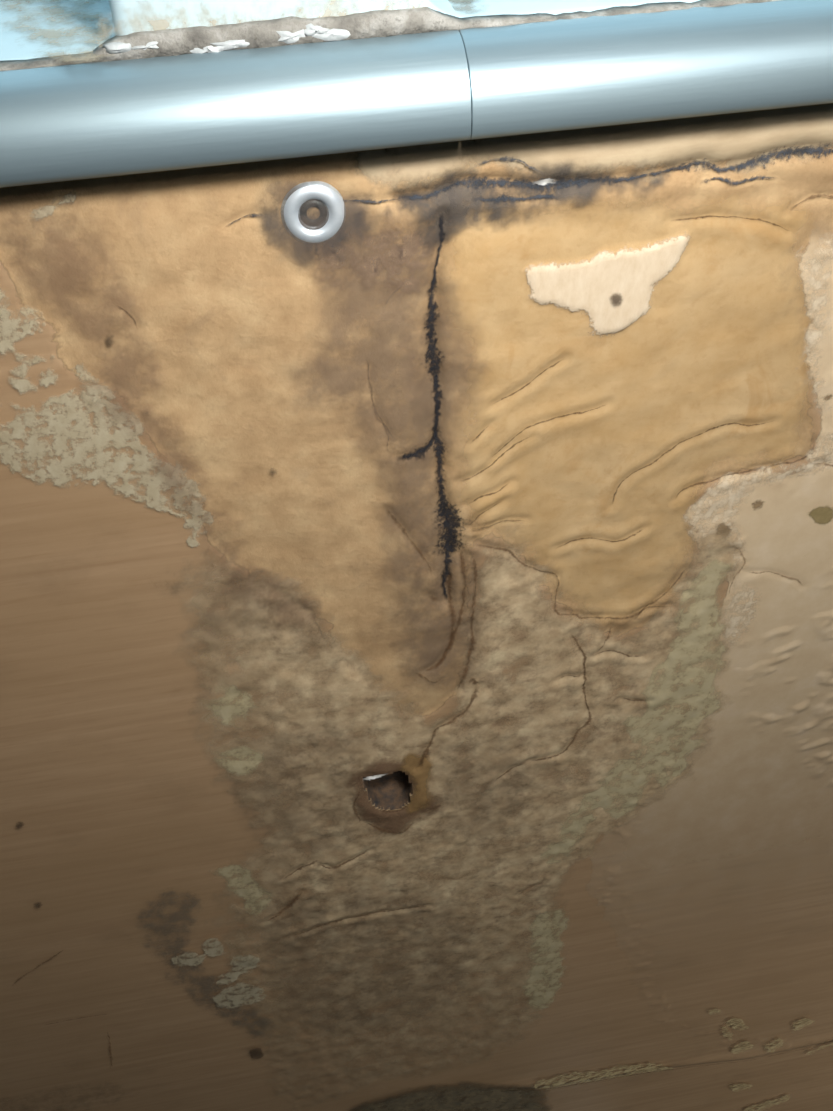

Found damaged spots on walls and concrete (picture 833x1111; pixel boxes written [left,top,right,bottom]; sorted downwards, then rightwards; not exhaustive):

peeling [33,194,76,219]
peeling [525,236,690,335]
peeling [804,241,833,366]
peeling [0,290,213,547]
water stain [263,165,614,675]
crack [343,144,833,765]
peeling [685,435,833,570]
water stain [172,938,265,1008]